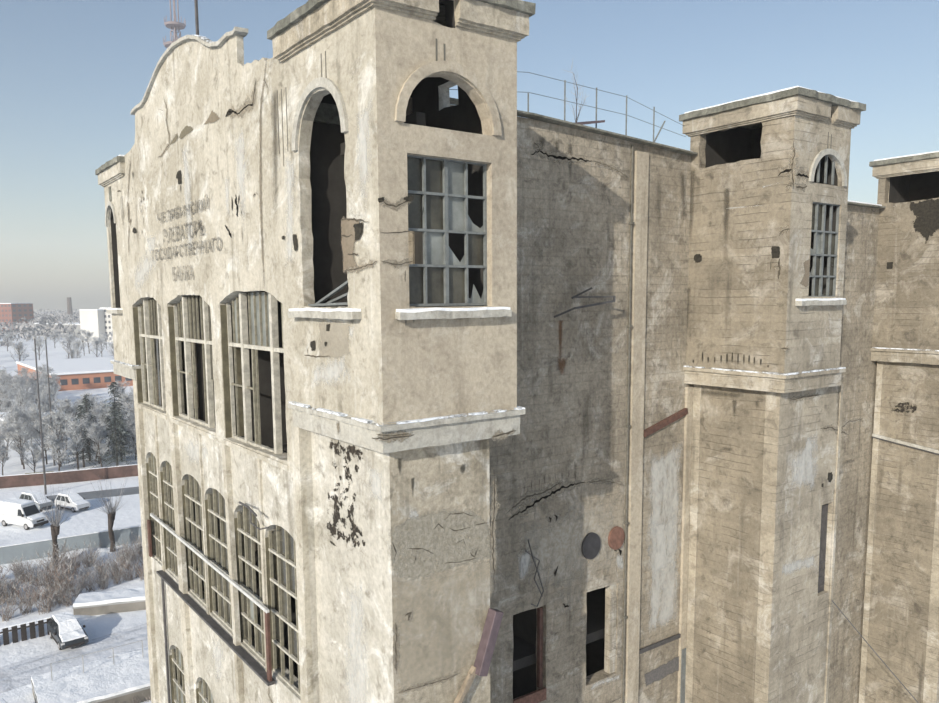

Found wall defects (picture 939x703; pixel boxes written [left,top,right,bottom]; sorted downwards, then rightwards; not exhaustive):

crack [159,97,176,157]
crack [532,143,629,178]
spalling [341,216,369,272]
peeling [909,198,939,244]
peeling [327,440,365,547]